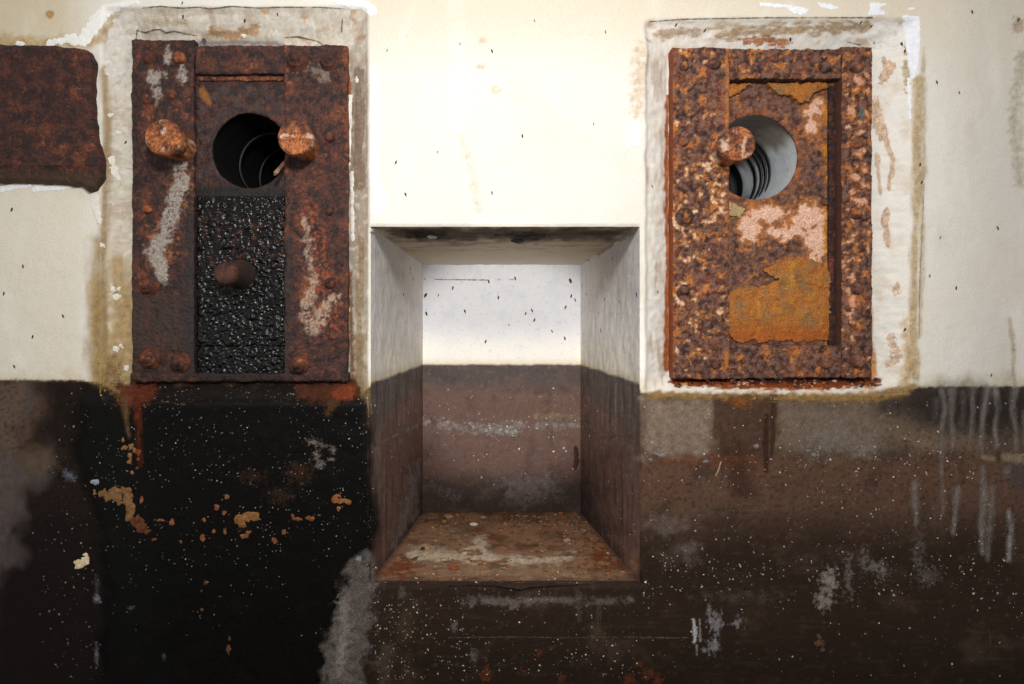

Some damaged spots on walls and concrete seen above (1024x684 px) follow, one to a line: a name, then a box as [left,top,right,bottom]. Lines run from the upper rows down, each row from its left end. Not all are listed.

peeling [46,0,140,47]
rust [729,83,750,98]
rust [765,82,828,105]
rust [664,95,881,494]
damp [639,63,1024,476]
damp [0,69,582,684]
rust [295,272,360,415]
rust [116,382,157,463]
damp [692,594,741,655]
damp [816,565,849,609]